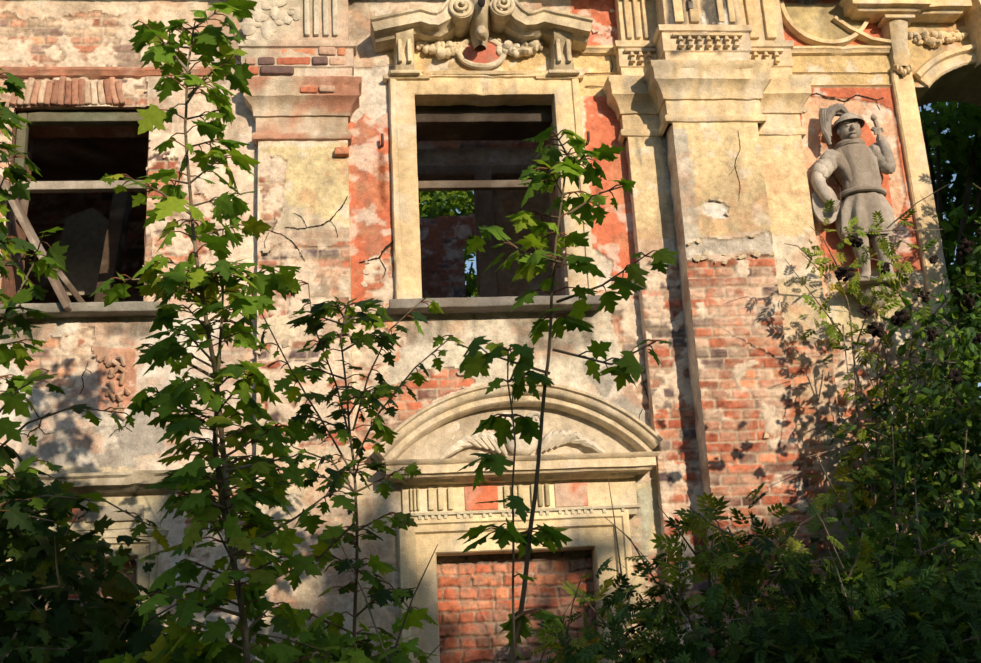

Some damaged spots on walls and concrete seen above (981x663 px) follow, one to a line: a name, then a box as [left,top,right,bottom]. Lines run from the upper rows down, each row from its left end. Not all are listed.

flaking render [588,0,617,43]
flaking render [0,10,148,226]
flaking render [258,151,288,231]
crack [259,196,348,262]
crack [359,241,393,283]
flaking render [704,197,732,218]
flaking render [12,326,99,393]
flaking render [255,240,476,449]
flaking render [611,231,898,663]